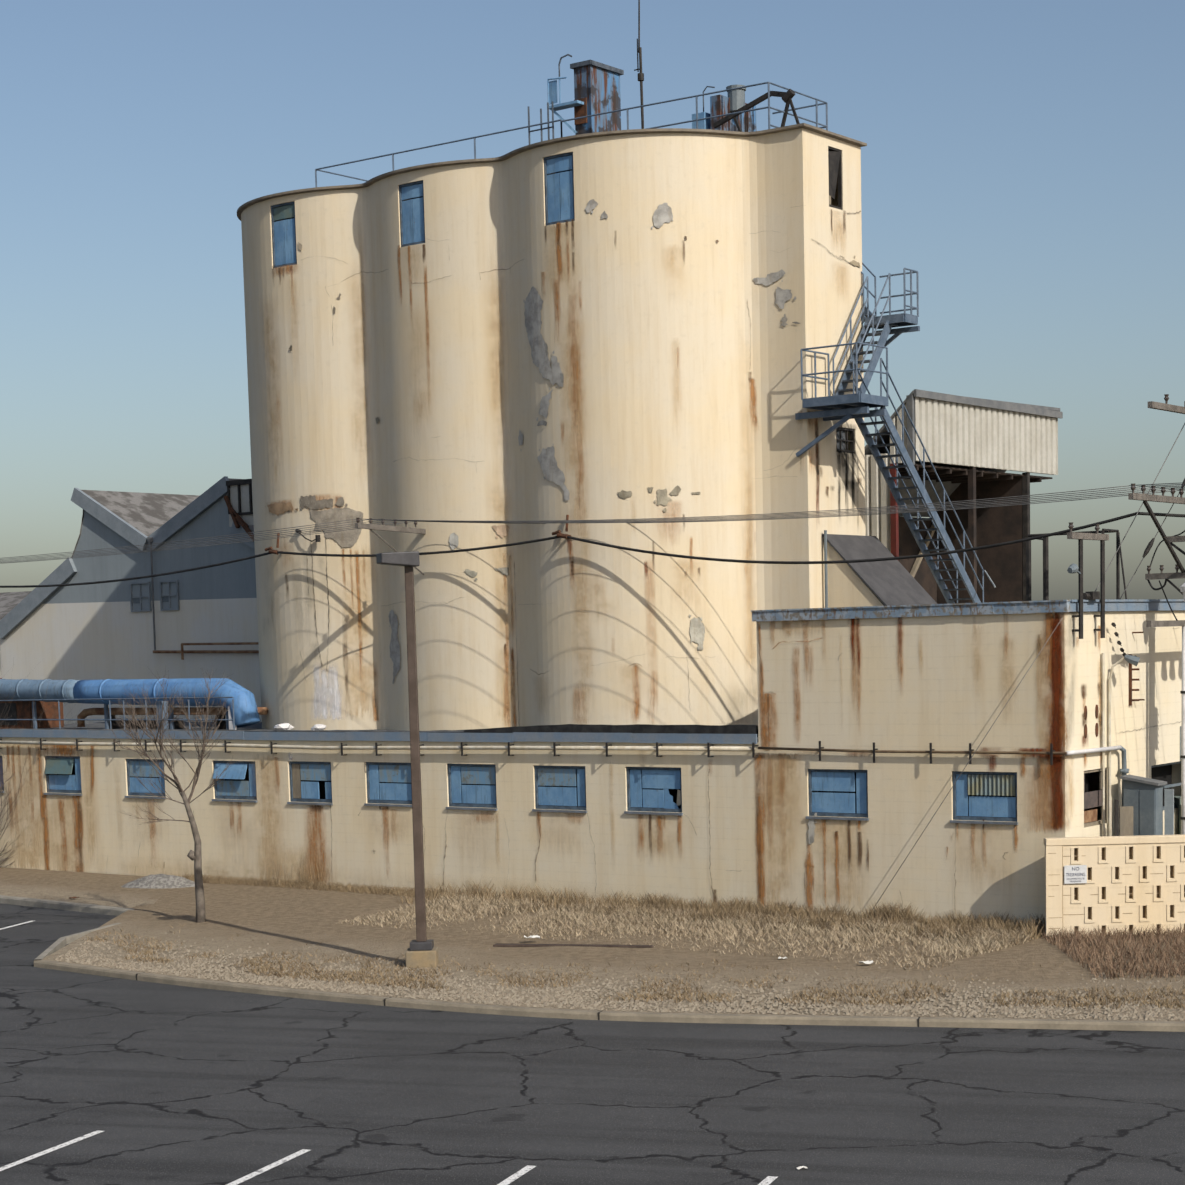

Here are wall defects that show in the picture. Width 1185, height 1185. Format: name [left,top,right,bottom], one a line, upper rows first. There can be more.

spalling [651,203,673,229]
spalling [753,269,800,327]
spalling [524,286,564,426]
spalling [267,495,363,548]
spalling [388,610,401,684]
spalling [689,614,705,650]
corrosion [851,618,860,668]
corrosion [755,663,775,767]
corrosion [1021,612,1068,829]
corrosion [7,745,94,872]
corrosion [757,794,765,909]
corrosion [804,819,869,908]